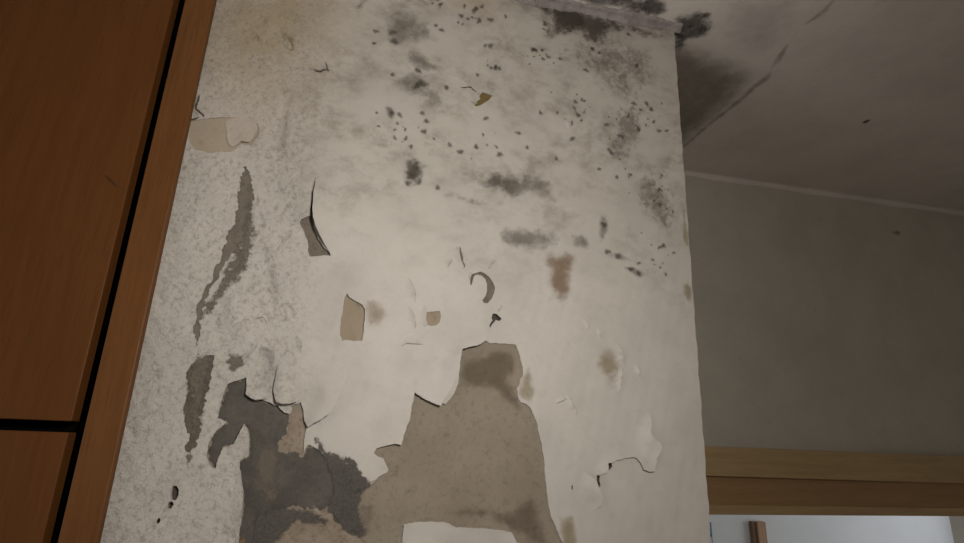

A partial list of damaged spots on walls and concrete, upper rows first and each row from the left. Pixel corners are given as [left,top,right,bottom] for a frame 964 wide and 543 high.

damp [587,0,665,15]
damp [543,8,646,54]
damp [675,14,729,131]
damp [406,161,421,185]
damp [553,258,570,292]
peeling [183,90,562,543]
peeling [571,413,663,509]